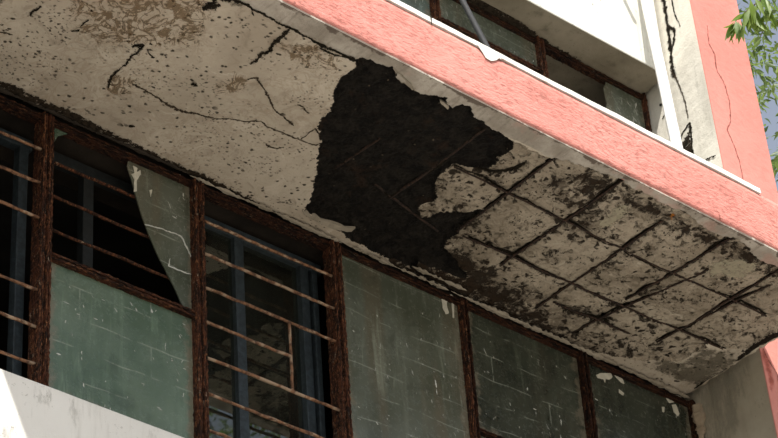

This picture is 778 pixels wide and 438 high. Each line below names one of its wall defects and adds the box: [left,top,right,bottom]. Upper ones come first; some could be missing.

crack [107,0,357,149]
crack [661,0,716,161]
crack [707,26,743,178]
spalling [302,57,778,362]